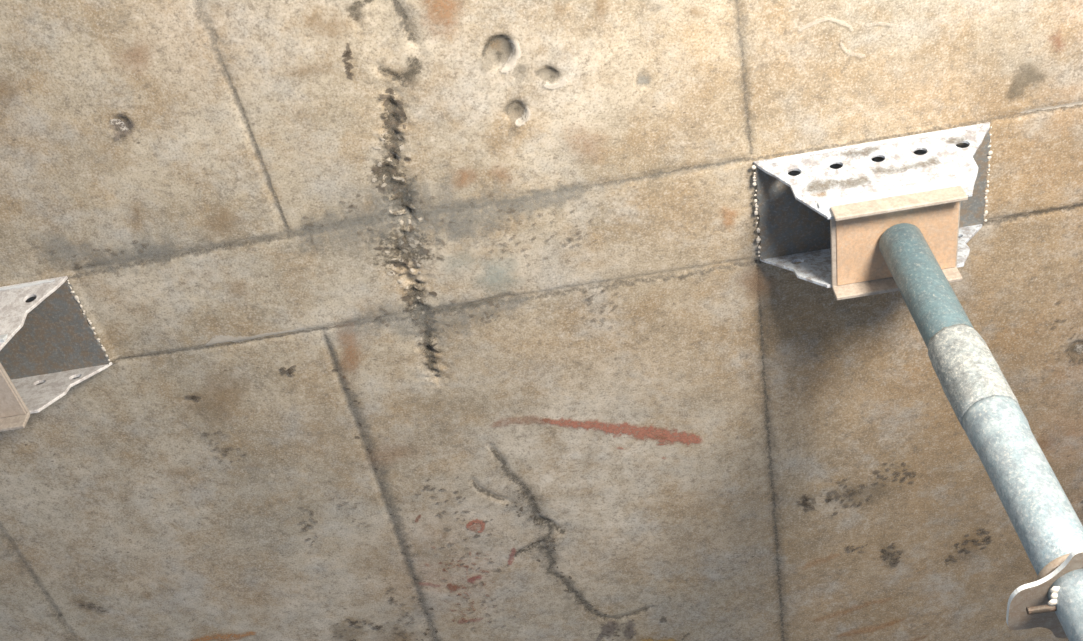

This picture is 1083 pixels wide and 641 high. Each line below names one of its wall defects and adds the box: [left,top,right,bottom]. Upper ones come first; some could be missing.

spalling [483,35,521,73]
spalling [538,68,568,89]
spalling [506,102,530,126]
crack [343,0,443,370]
corrosion [498,418,702,449]
crack [473,450,647,619]